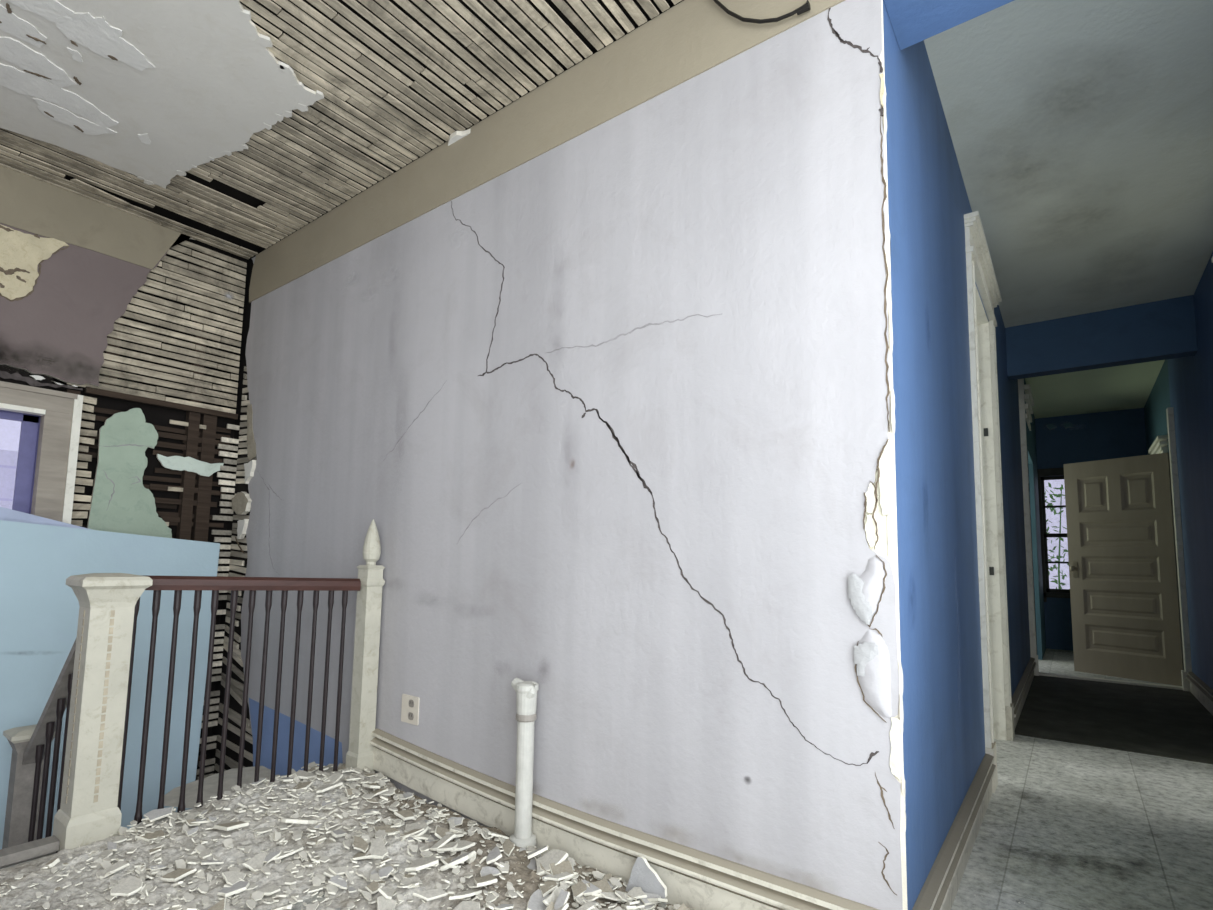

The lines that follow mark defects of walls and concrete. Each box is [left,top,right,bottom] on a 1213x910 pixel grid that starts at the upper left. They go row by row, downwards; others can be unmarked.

crack [827,8,881,62]
flaking render [0,0,682,781]
crack [451,202,897,895]
spalling [890,662,906,832]